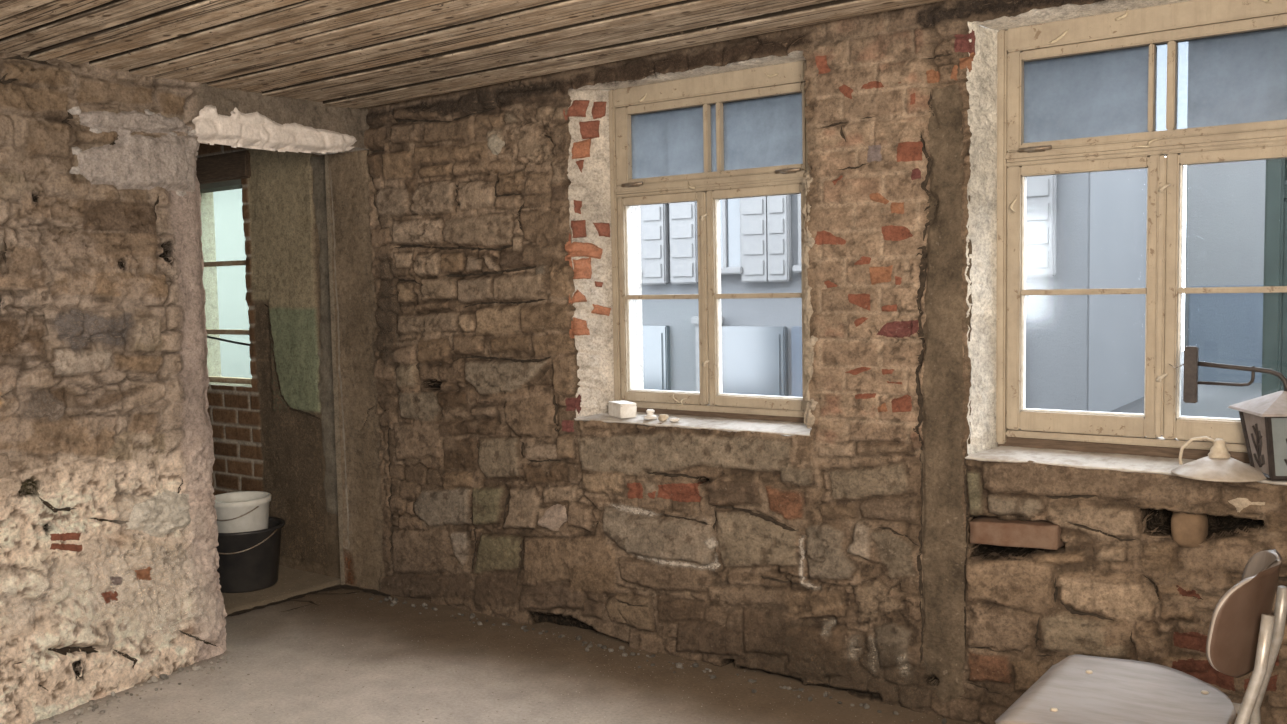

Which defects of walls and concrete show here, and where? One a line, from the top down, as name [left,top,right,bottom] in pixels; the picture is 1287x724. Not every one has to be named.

flaking render [563,100,606,172]
flaking render [565,200,611,338]
crack [879,92,938,664]
crack [39,497,129,558]
crack [15,646,138,691]